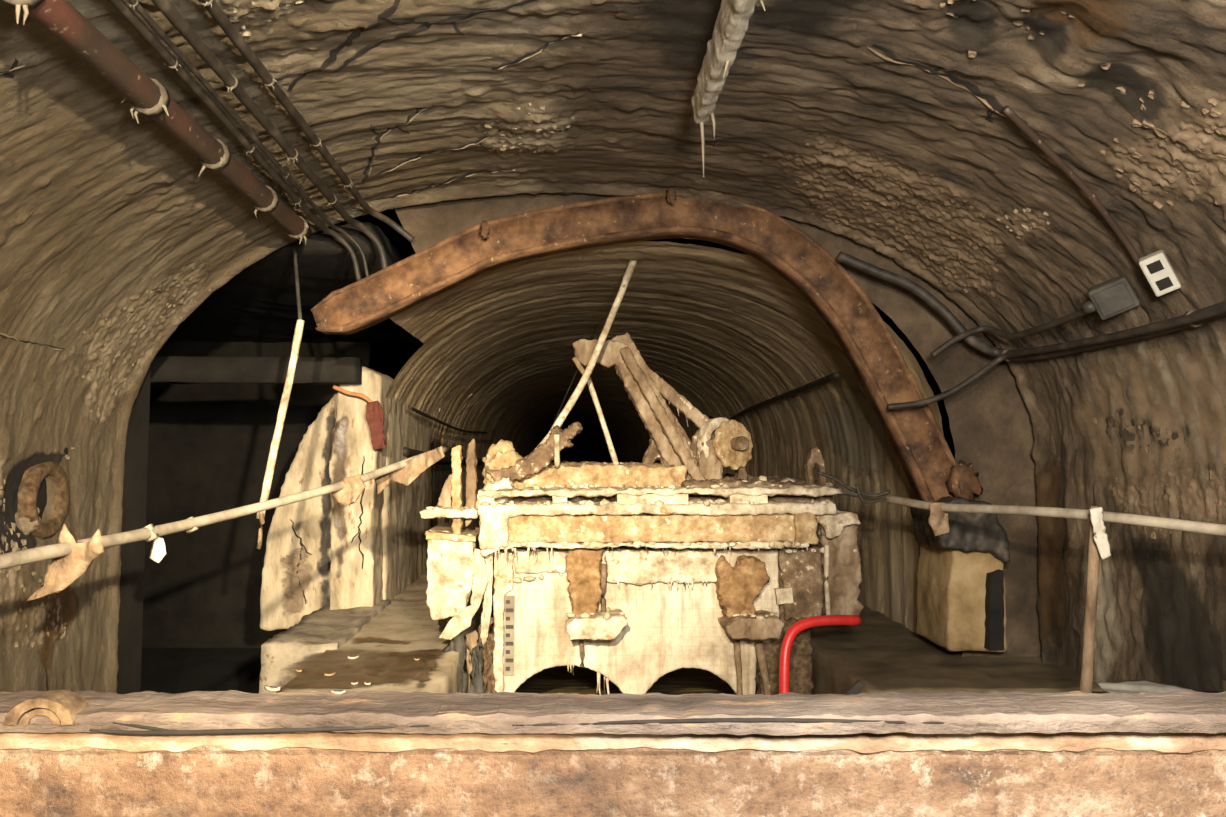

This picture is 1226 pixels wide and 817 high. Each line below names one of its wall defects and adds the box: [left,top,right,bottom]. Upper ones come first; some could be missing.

water stain [638,0,722,71]
water stain [317,411,348,609]